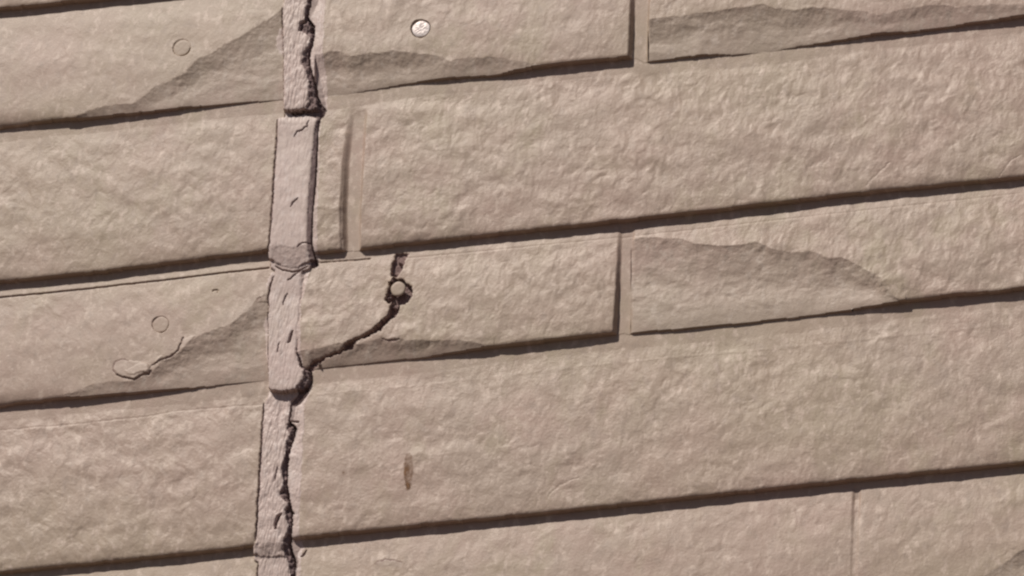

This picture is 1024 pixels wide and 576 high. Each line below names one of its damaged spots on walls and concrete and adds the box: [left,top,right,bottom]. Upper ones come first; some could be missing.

crack [277,0,326,301]
crack [309,253,413,373]
crack [275,400,306,576]